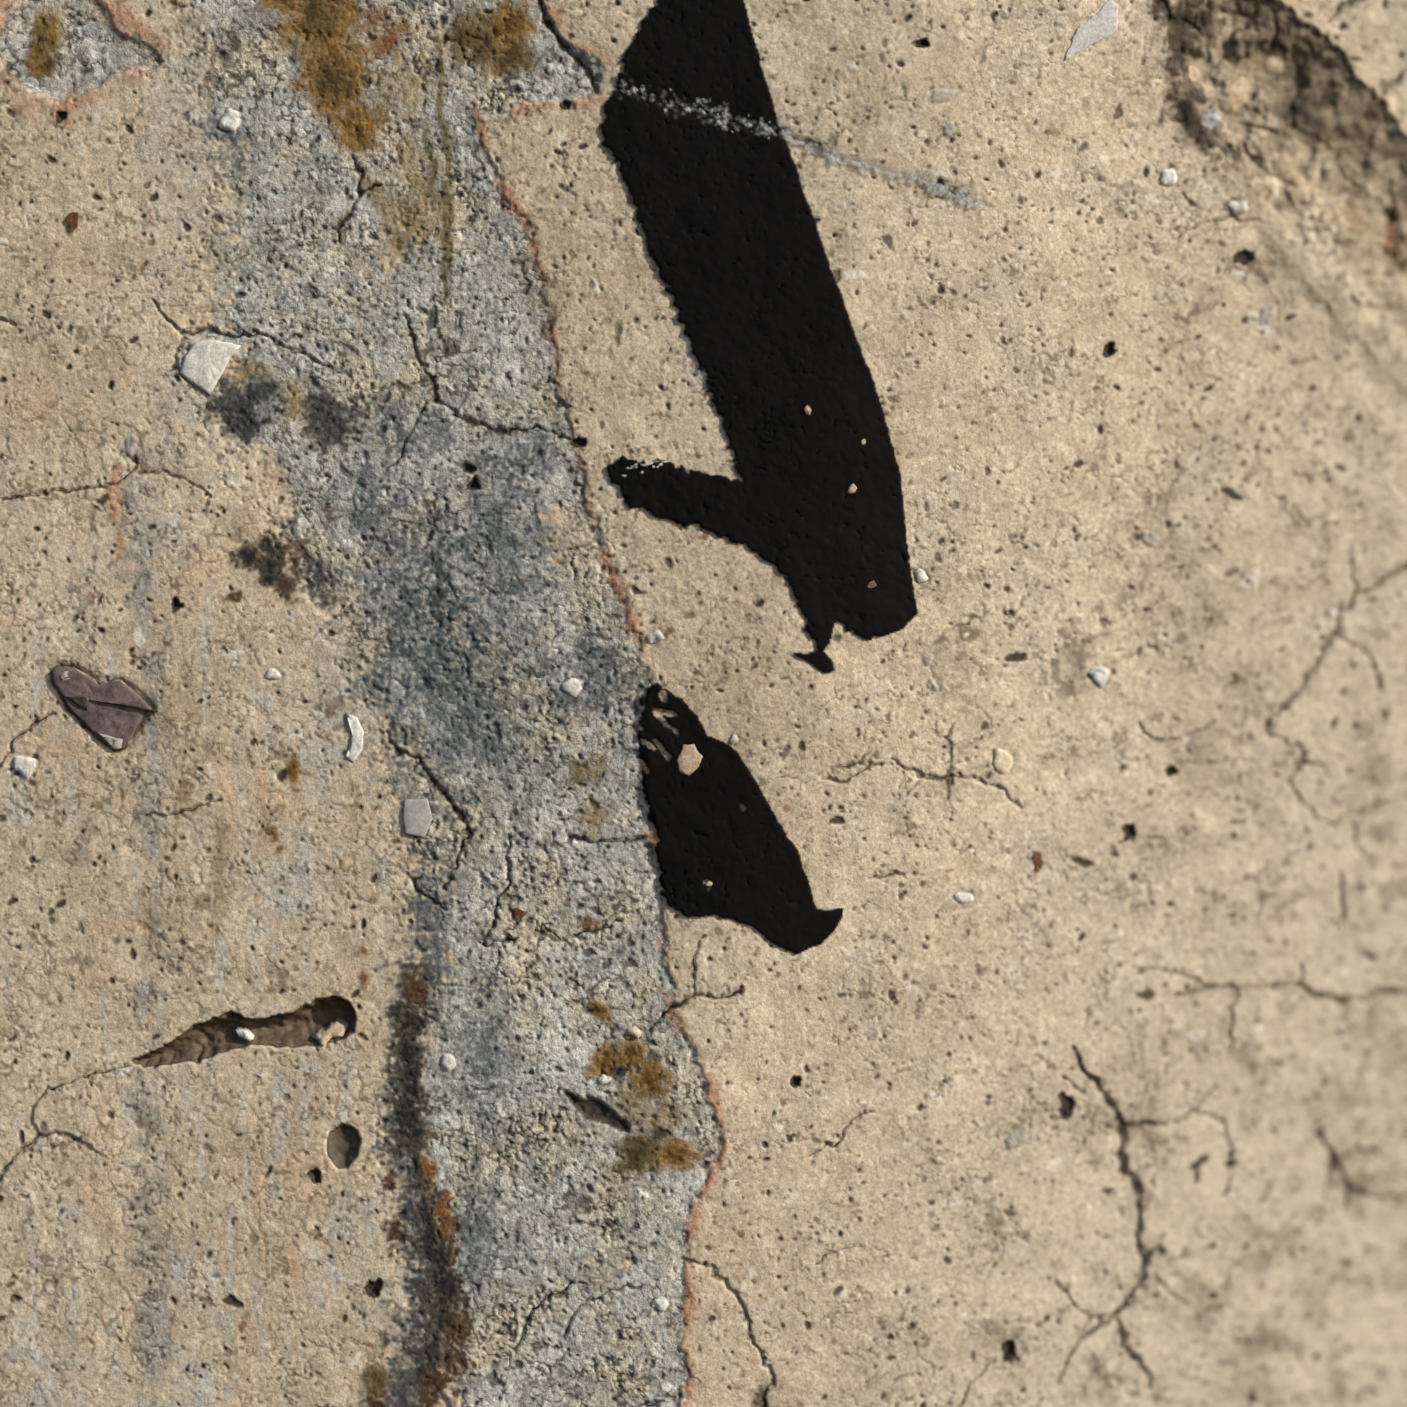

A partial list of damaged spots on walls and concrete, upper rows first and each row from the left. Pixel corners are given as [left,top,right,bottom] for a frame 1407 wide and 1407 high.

spalling [1153,0,1407,378]
leakage [207,375,363,454]
flaking render [120,476,158,617]
leakage [225,590,242,602]
leakage [230,531,345,610]
flaking render [179,0,724,1407]
crack [1266,546,1407,841]
crack [0,1065,130,1179]
spalling [131,997,355,1147]
crack [1056,1049,1233,1388]
flaking render [131,1186,176,1407]
leakage [754,1385,770,1407]